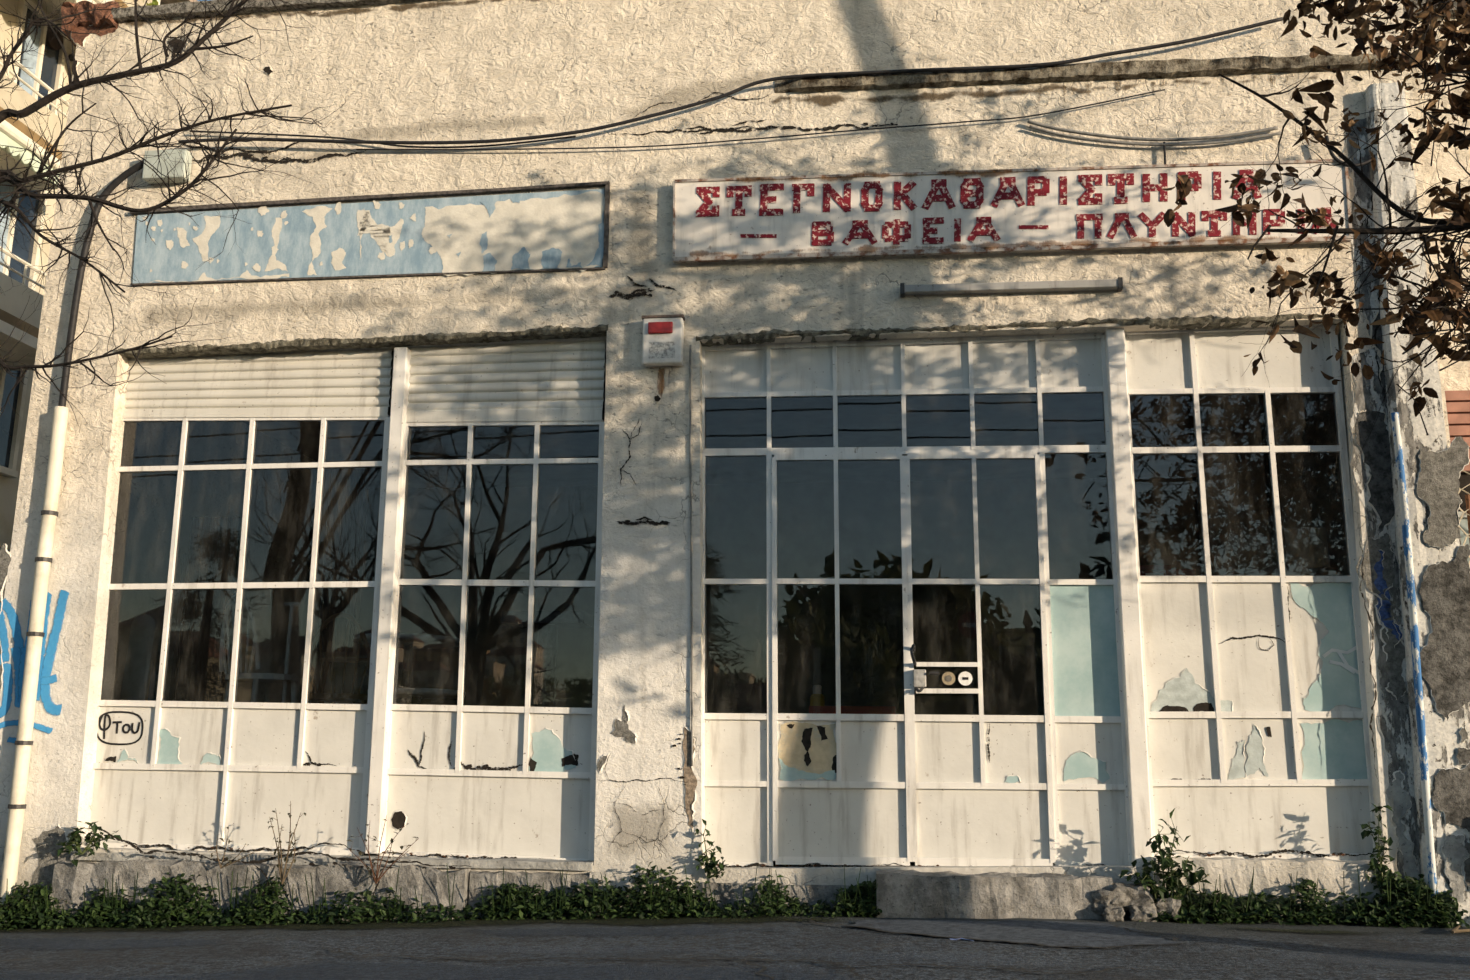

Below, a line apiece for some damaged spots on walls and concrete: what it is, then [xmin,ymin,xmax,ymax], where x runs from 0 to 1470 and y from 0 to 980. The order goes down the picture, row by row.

crack [623,92,898,135]
peeling [1290,118,1470,904]
spalling [0,543,11,614]
peeling [528,705,638,773]
crack [588,755,687,861]
peeling [672,727,697,833]